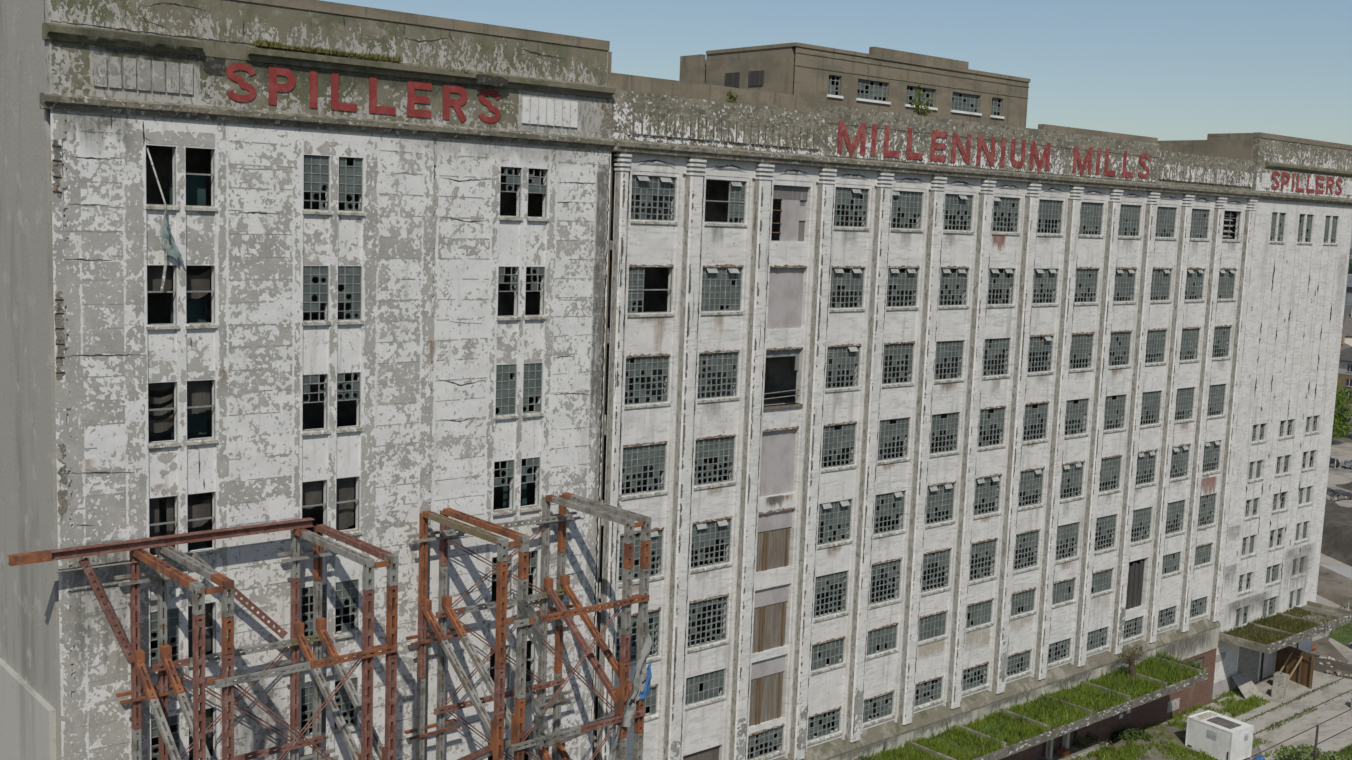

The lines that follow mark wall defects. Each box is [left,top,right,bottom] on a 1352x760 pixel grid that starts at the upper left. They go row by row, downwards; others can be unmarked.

peeling [51,110,626,760]